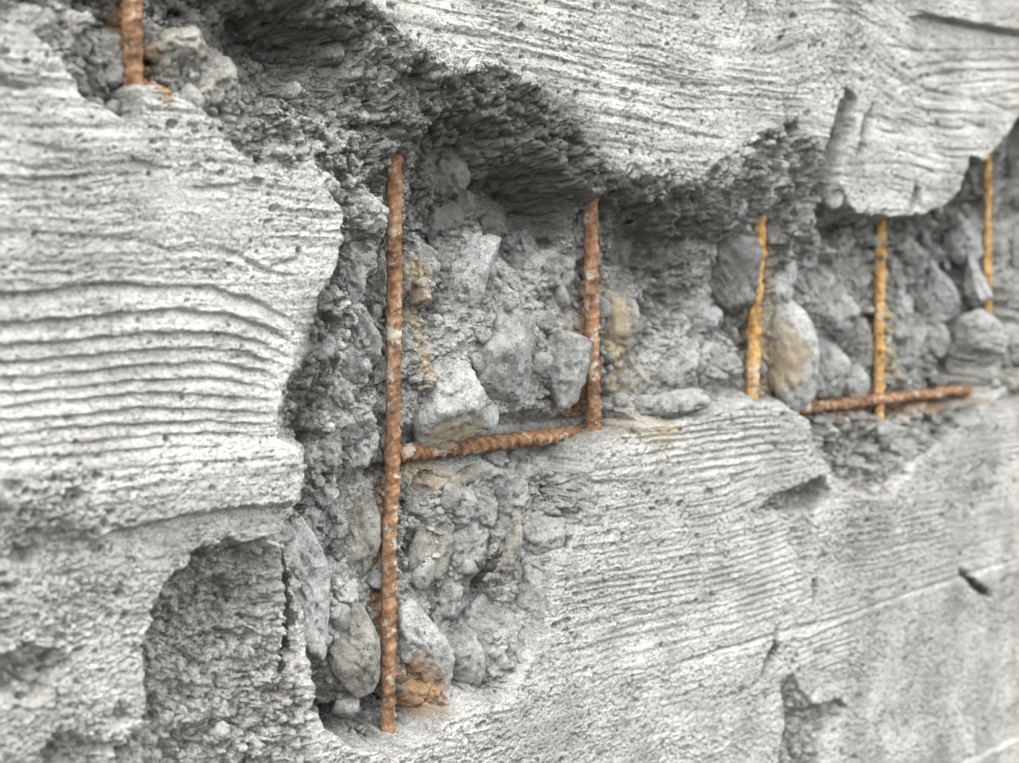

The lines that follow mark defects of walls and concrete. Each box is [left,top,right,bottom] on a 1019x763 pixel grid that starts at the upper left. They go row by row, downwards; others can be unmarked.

spalling [120,0,144,87]
spalling [580,198,601,431]
spalling [745,215,767,399]
spalling [872,219,887,398]
rust [559,385,585,424]
spalling [799,385,972,416]
rust [811,386,972,415]
spalling [379,152,405,734]
spalling [400,424,586,463]
spalling [756,475,831,517]
rust [371,588,382,657]
spalling [0,639,75,707]